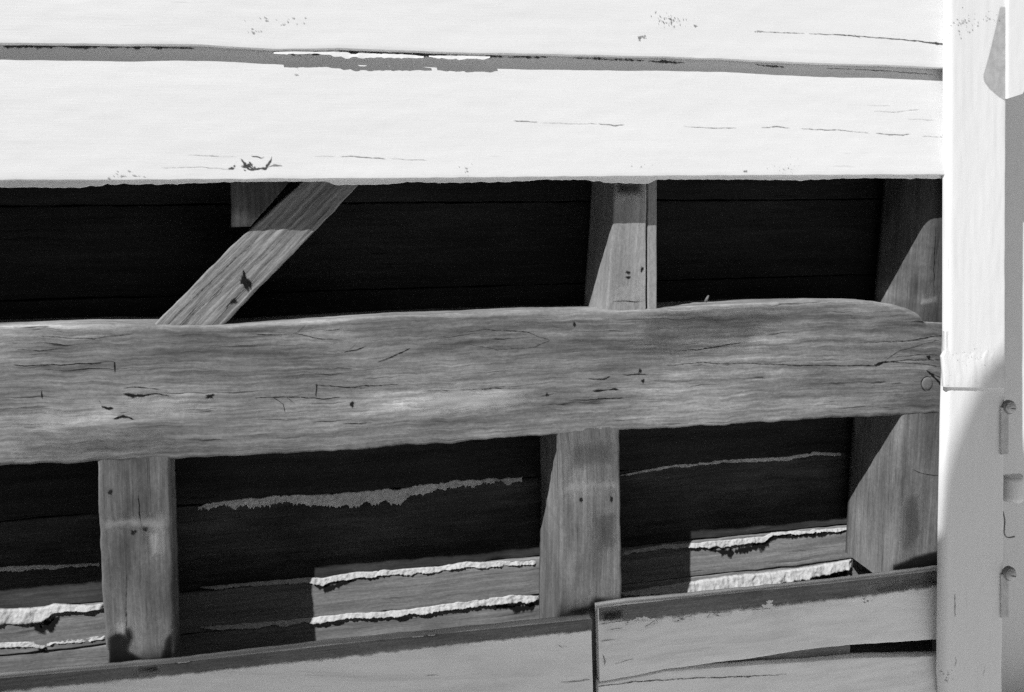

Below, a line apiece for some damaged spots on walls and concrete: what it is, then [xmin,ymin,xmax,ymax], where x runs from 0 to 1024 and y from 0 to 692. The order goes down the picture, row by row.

crack [756,31,943,45]
peeling [274,50,490,60]
peeling [229,156,282,171]
spalling [710,530,845,558]
spalling [802,570,848,581]
spalling [316,580,352,593]
spalling [496,602,535,614]
spalling [31,616,59,634]